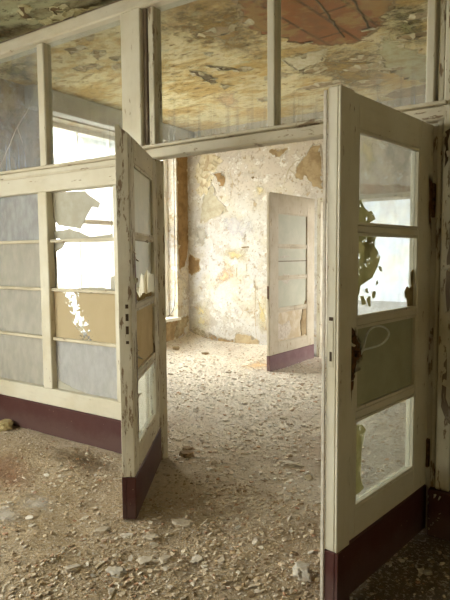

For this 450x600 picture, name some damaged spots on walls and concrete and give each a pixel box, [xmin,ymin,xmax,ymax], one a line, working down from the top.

peeling [17,4,90,26]
water stain [166,7,261,59]
flaking render [197,0,267,37]
flaking render [281,0,428,99]
peeling [189,65,254,89]
water stain [306,51,381,89]
spalling [269,146,288,159]
spalling [294,143,323,191]
spalling [176,154,227,276]